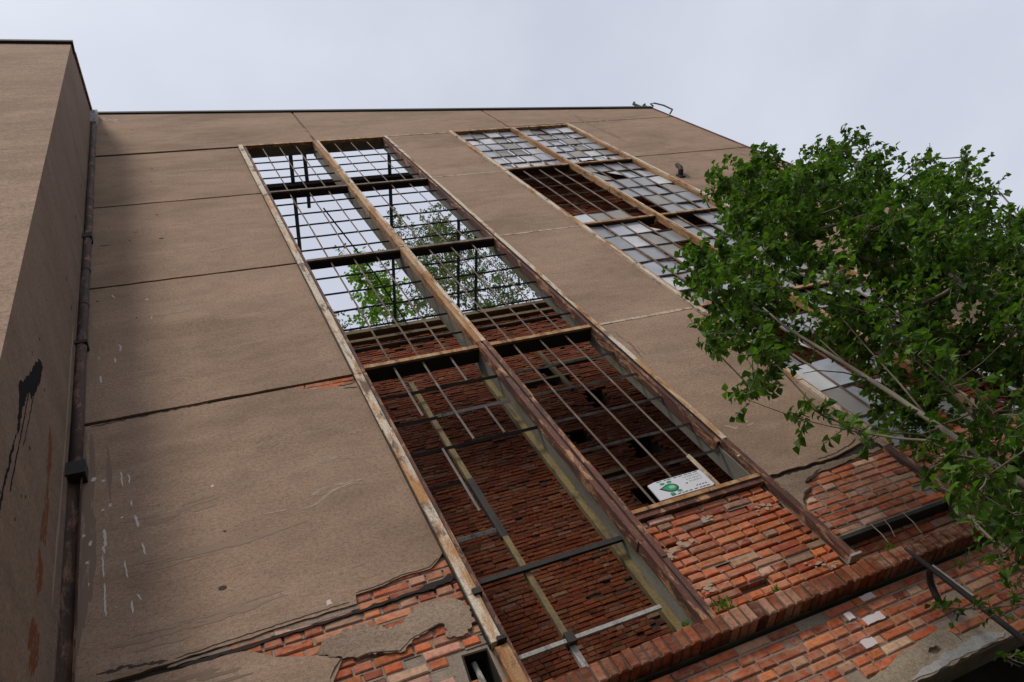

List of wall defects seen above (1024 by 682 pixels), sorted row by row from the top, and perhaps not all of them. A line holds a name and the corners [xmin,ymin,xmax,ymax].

crack [803,438,856,500]
spalling [803,450,945,537]
crack [177,558,455,669]
spalling [222,556,507,682]
crack [330,623,439,679]